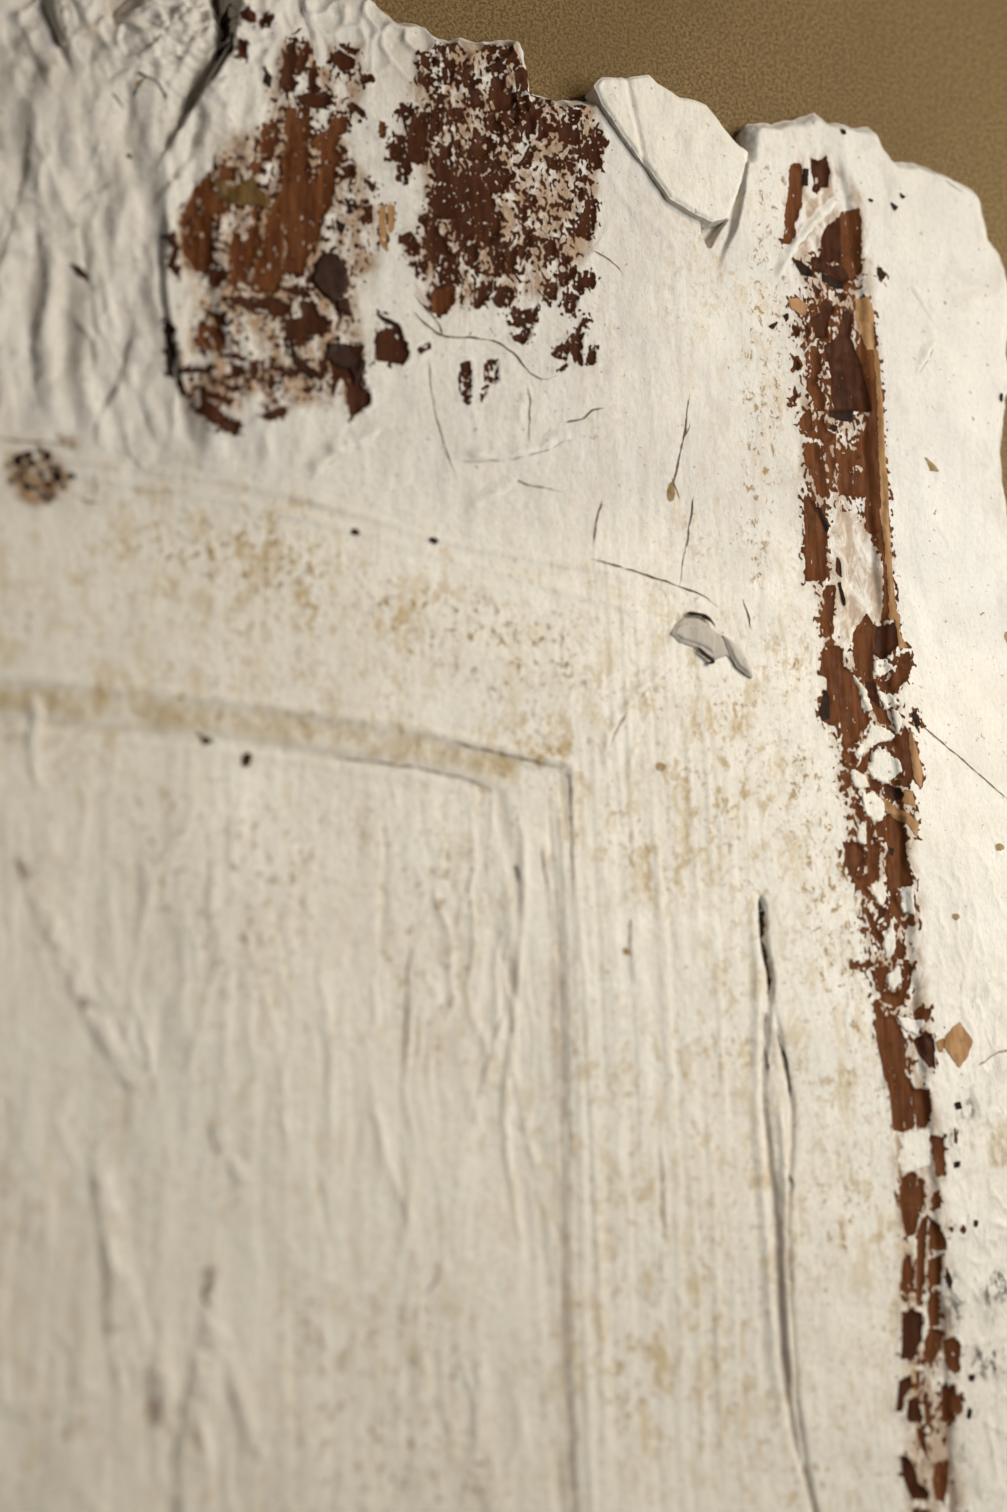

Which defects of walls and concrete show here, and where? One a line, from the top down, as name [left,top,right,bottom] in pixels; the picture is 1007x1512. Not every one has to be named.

peeling [160,3,613,438]
crack [758,897,791,1099]
peeling [769,155,978,1512]